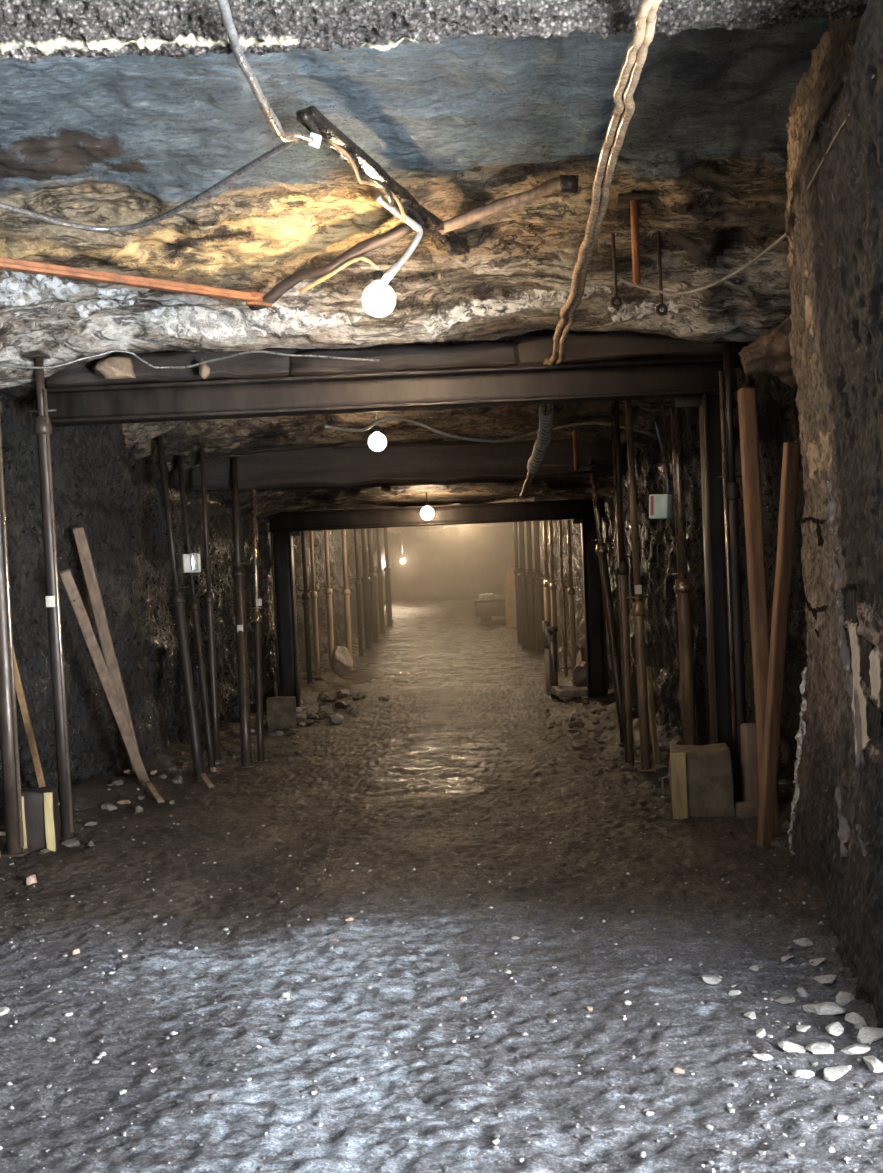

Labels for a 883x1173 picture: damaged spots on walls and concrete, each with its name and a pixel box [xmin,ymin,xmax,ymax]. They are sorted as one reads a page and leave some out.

crack [801,517,827,546]
crack [805,597,828,637]
flaking render [836,586,883,757]